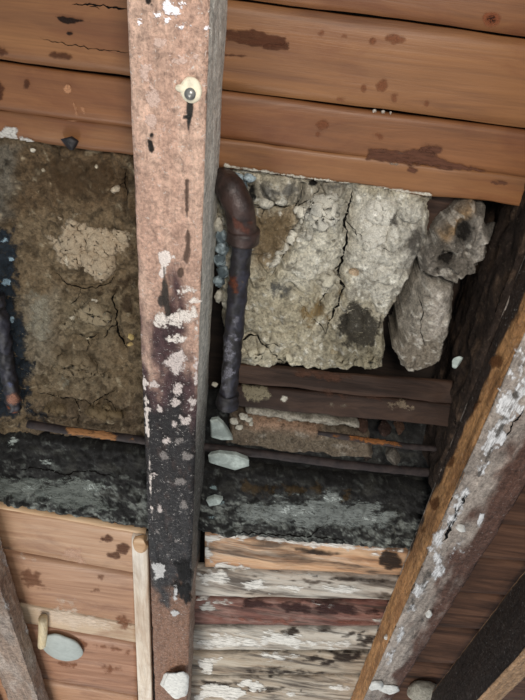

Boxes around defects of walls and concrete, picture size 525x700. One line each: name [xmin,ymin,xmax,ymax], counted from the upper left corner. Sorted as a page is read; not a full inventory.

crack [72,2,125,10]
damp [226,29,289,50]
damp [366,146,484,173]
crack [299,190,387,334]
crack [57,273,127,350]
rust [66,427,116,441]
rust [349,435,402,447]
damp [236,480,399,530]
peeling [257,536,384,556]
peeling [197,535,250,585]
peeling [196,630,350,660]
peeling [194,679,264,700]